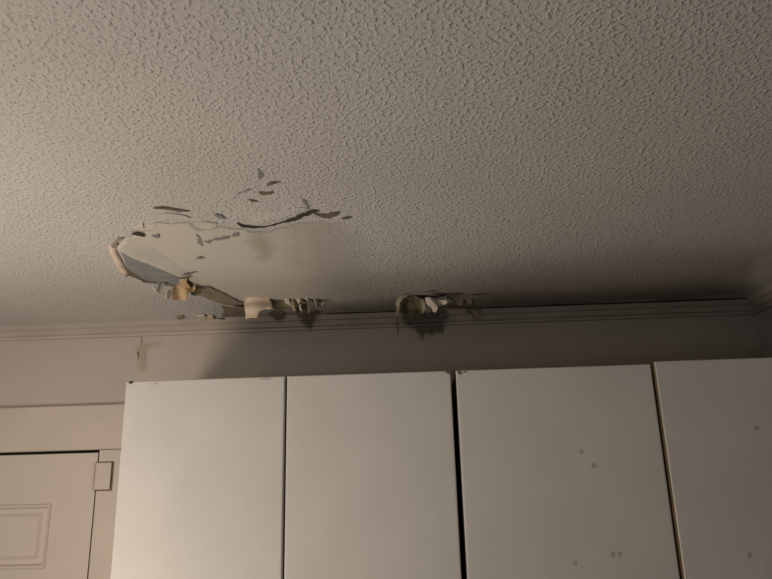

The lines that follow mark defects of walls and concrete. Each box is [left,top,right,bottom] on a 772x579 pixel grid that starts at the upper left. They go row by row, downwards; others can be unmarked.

crack [233,169,352,229]
peeling [108,207,346,320]
peeling [395,291,480,321]